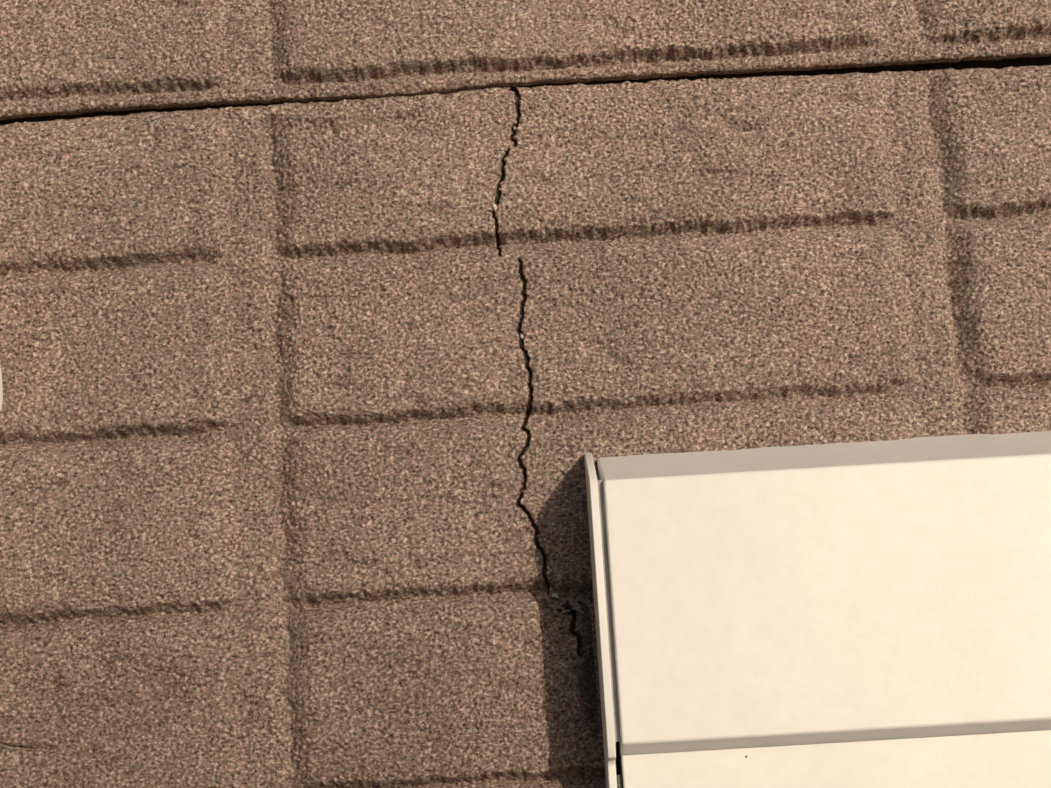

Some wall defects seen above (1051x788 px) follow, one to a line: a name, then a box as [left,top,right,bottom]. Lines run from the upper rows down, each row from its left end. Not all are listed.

crack [488,86,587,656]